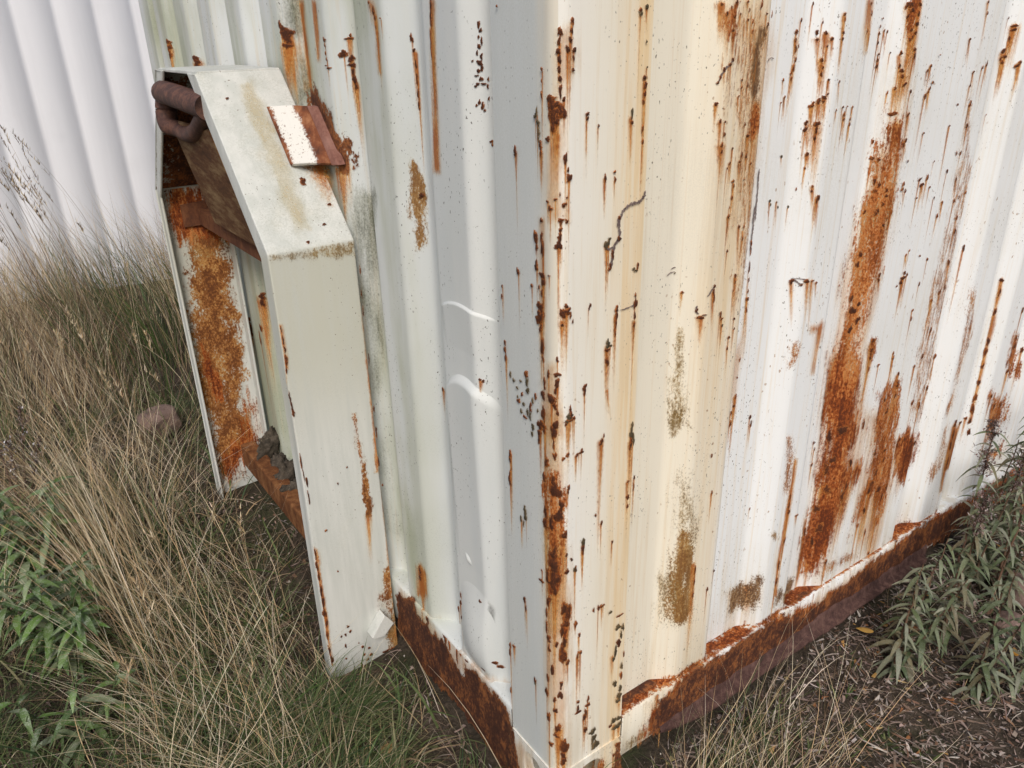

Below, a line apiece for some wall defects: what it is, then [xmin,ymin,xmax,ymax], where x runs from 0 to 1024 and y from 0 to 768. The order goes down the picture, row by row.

corrosion [176,110,193,124]
corrosion [409,160,429,250]
crack [607,190,646,271]
corrosion [156,134,288,493]
corrosion [516,17,587,768]
corrosion [583,0,1024,768]
corrosion [352,354,384,544]
corrosion [509,730,519,768]
corrosion [575,695,590,741]